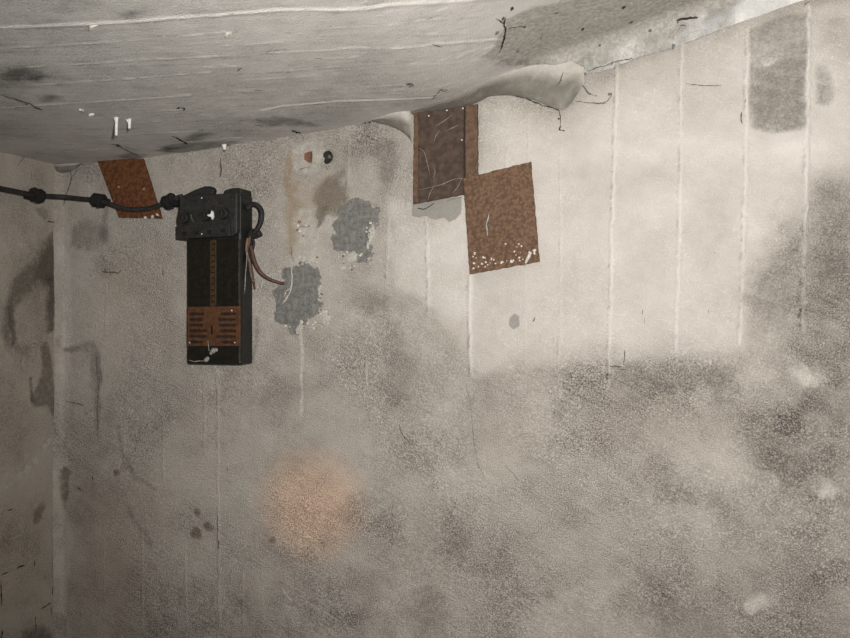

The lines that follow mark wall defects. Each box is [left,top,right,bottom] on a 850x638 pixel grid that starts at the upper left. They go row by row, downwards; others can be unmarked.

crack [496,17,524,53]
crack [516,58,633,131]
peeling [331,197,380,271]
damp [5,240,54,343]
peeling [272,208,331,336]